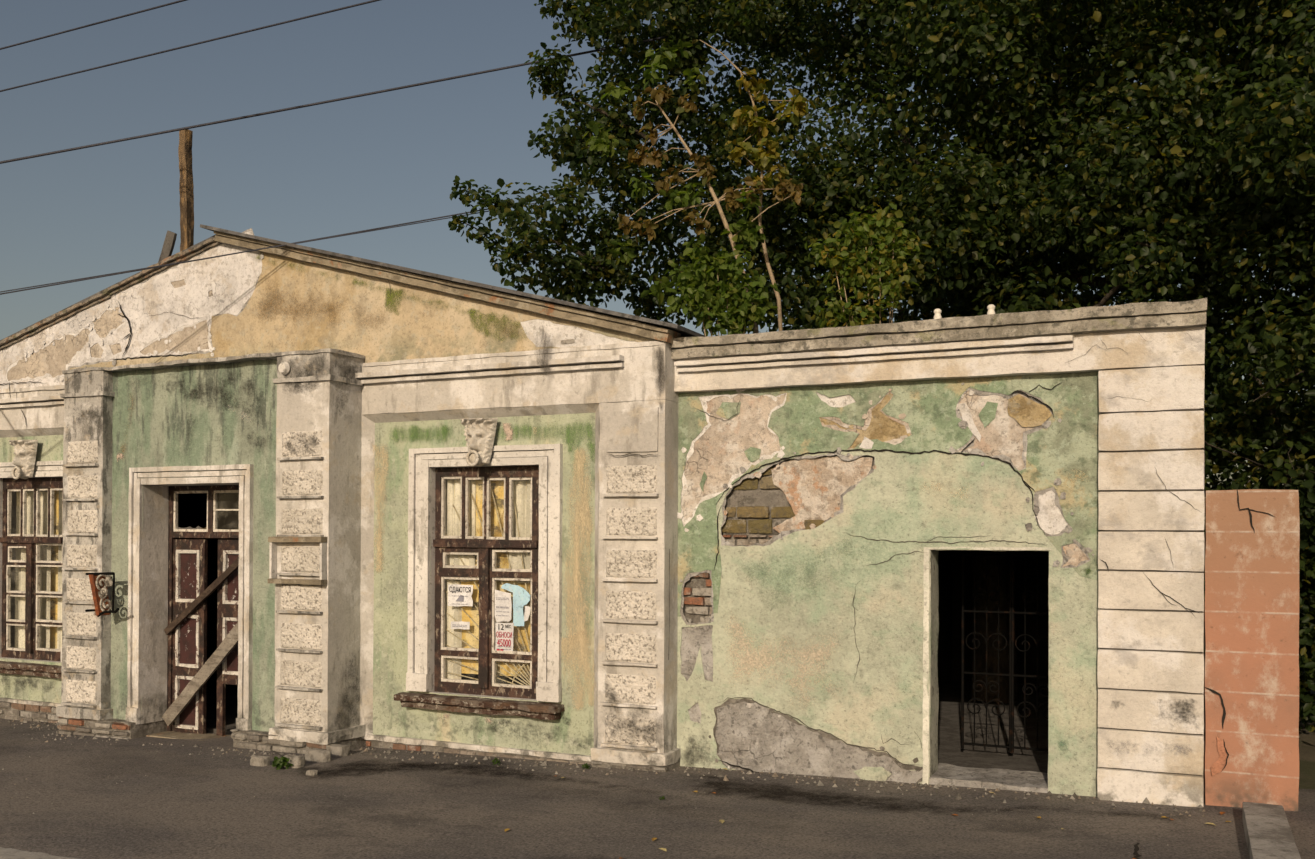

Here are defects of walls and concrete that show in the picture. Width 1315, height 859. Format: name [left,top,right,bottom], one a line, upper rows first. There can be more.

peeling [0,228,264,389]
water stain [385,289,402,312]
water stain [469,310,520,338]
water stain [167,374,259,408]
flaking render [677,389,912,547]
flaking render [949,382,1062,471]
crack [1237,490,1275,533]
crack [1146,539,1199,619]
flaking render [680,570,714,682]
flaking render [688,698,923,783]
crack [1205,687,1229,772]